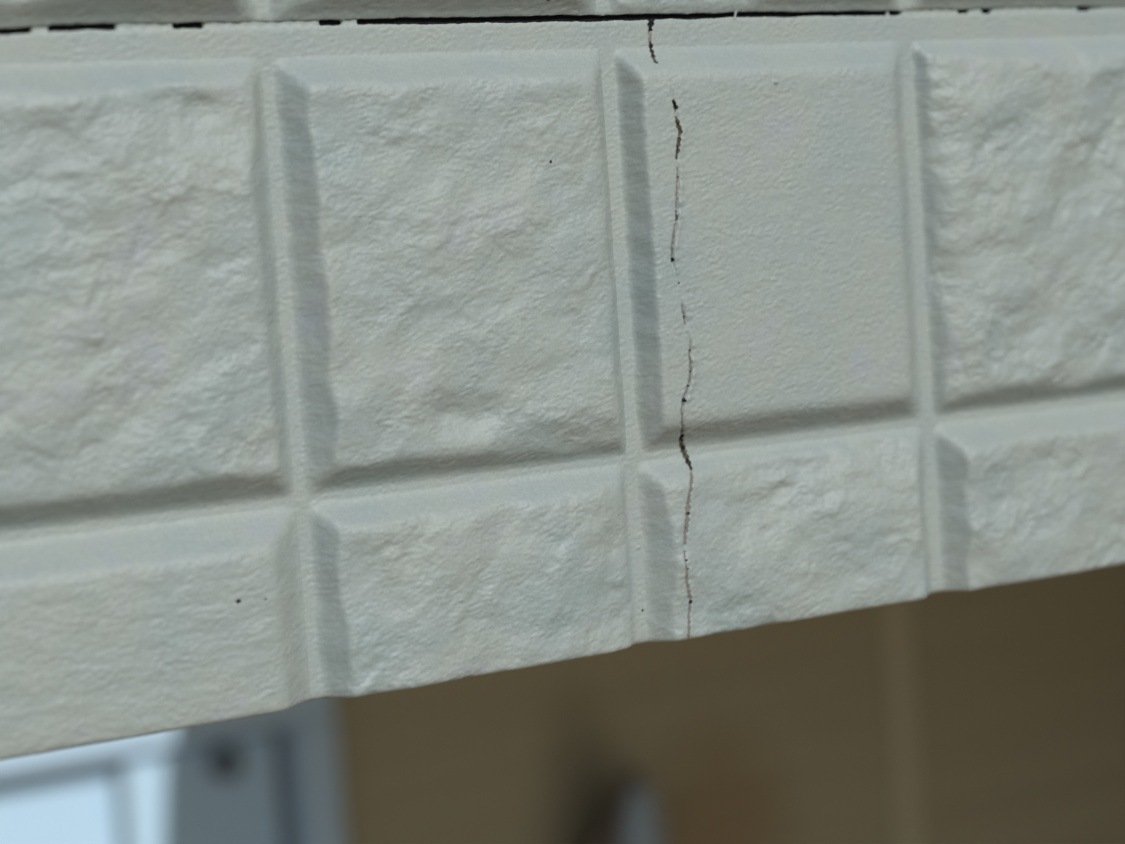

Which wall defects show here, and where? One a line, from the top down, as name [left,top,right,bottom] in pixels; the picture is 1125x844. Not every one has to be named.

crack [647,19,658,63]
crack [671,99,694,638]